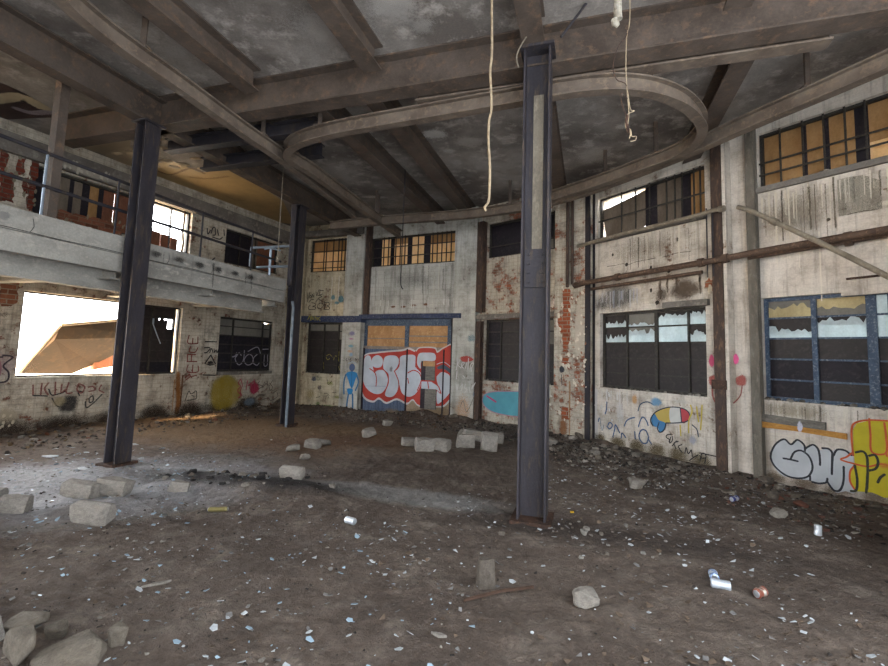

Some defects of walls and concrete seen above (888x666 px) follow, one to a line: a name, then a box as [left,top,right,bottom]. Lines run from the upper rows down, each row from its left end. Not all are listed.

flaking render [0,151,39,212]
damp [761,168,888,245]
flaking render [0,283,23,308]
flaking render [549,285,628,439]